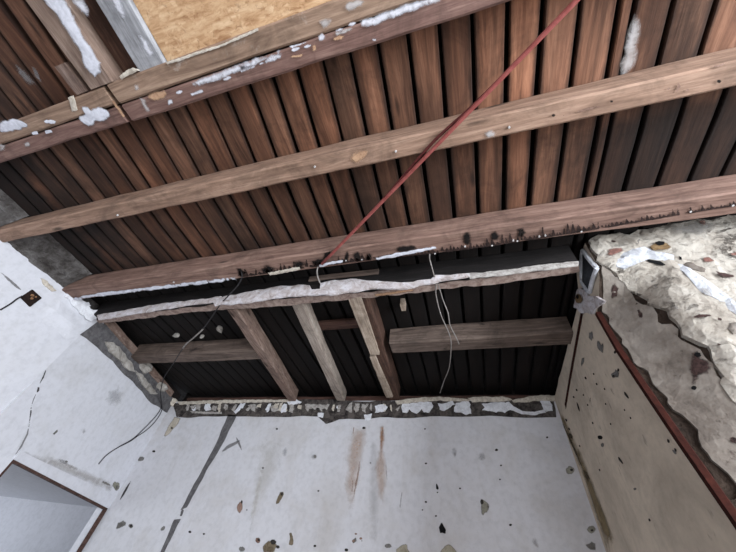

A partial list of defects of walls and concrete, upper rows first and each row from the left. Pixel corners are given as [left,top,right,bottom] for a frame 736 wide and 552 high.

crack [16,370,46,454]
crack [223,438,242,451]
peeling [64,293,556,436]
leakage [562,417,612,542]
flaking render [574,214,736,485]